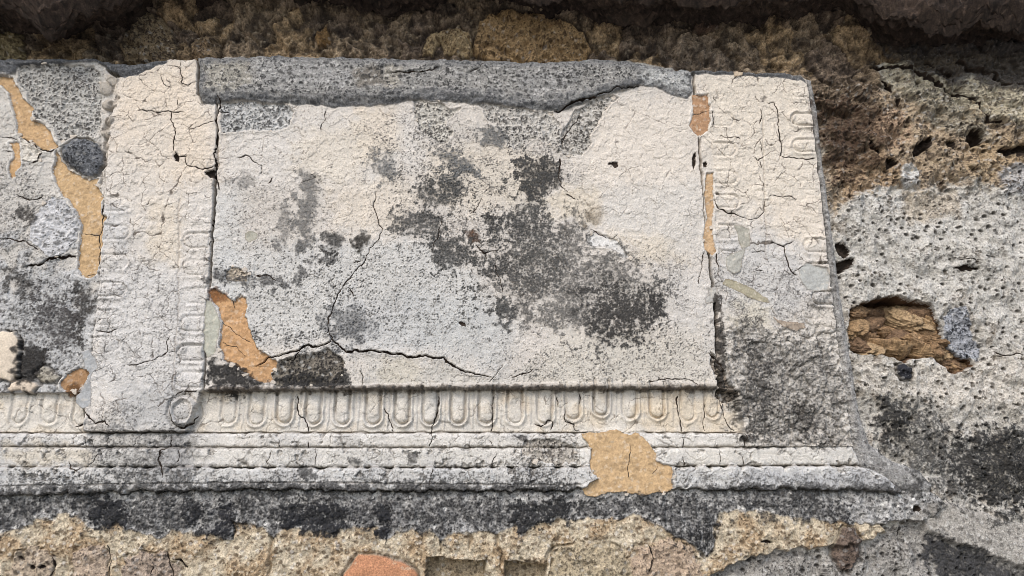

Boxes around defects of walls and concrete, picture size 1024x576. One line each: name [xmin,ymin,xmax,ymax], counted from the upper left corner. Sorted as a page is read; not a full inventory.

spalling [0,62,107,278]
crack [138,61,272,246]
leakage [369,147,397,187]
leakage [475,125,507,147]
crack [694,102,814,220]
leakage [387,146,671,359]
crack [752,242,800,281]
peeling [209,290,345,387]
crack [223,193,533,462]
spalling [847,295,973,374]
leakage [0,392,1024,557]
peeling [521,429,677,497]